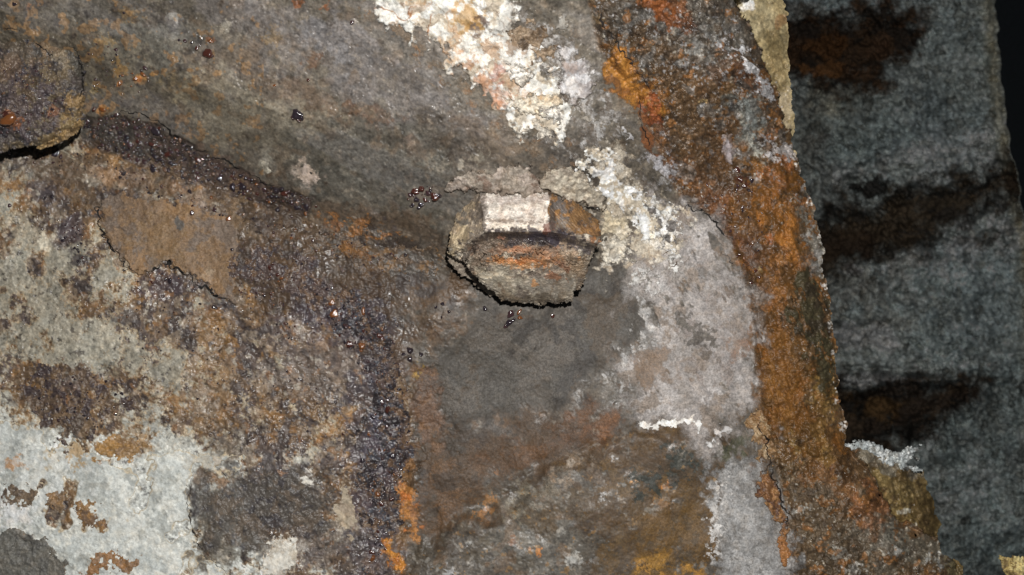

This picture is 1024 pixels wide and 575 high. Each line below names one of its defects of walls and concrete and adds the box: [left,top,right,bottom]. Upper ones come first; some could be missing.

peeling [37,119,83,150]
rust [602,34,670,157]
rust [637,0,681,32]
rust [787,0,928,101]
rust [33,43,519,573]
rust [503,309,523,328]
water stain [359,0,806,575]
rust [706,148,1024,434]
rust [833,366,992,467]
rust [521,416,724,575]